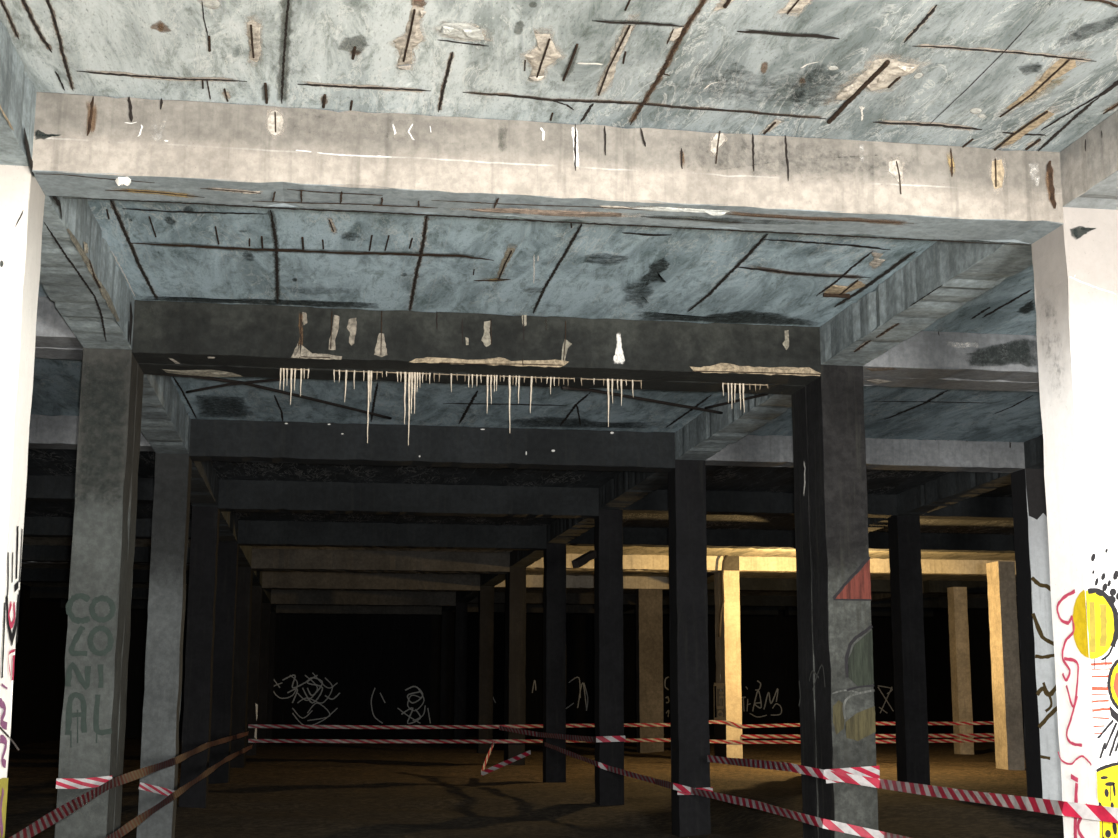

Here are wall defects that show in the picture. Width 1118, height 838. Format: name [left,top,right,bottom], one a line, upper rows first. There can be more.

spalling [393,5,426,70]
peeling [435,23,484,40]
spalling [524,32,579,81]
spalling [779,0,810,15]
spalling [827,57,922,124]
spalling [999,58,1076,118]
spalling [410,319,572,367]
water stain [614,334,625,364]
spalling [691,363,821,376]
water stain [333,370,642,445]
water stain [722,383,768,412]